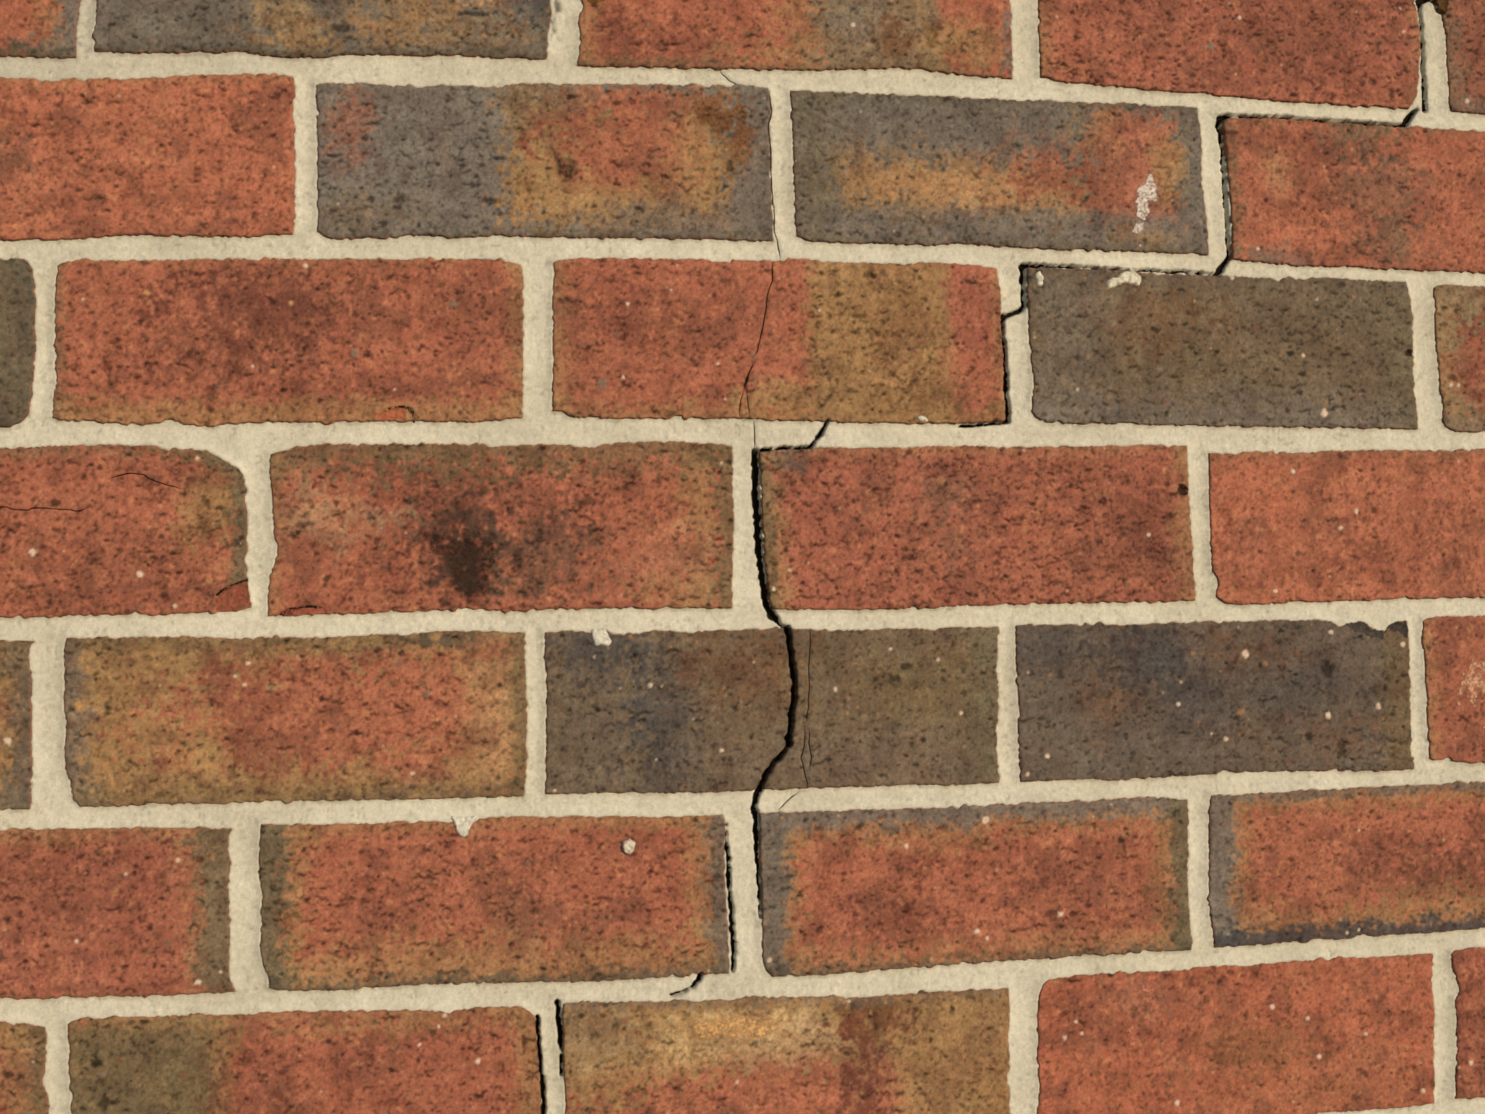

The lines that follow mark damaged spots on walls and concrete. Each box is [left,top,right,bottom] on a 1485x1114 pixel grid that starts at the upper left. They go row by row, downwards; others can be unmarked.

crack [958,0,1430,428]
crack [670,98,826,995]
crack [535,1001,563,1114]